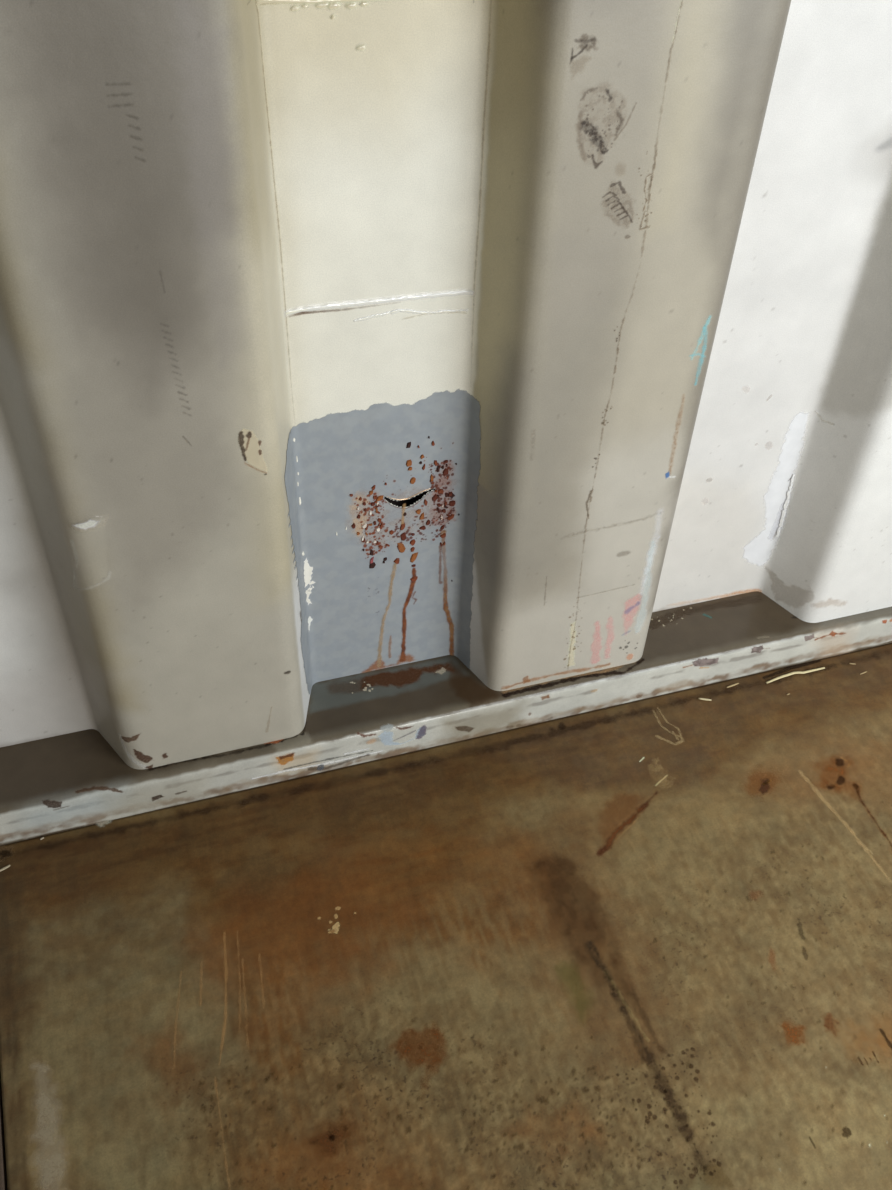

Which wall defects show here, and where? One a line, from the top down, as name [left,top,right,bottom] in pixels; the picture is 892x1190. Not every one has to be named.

rust [349,436,460,692]
peeling [743,413,808,566]